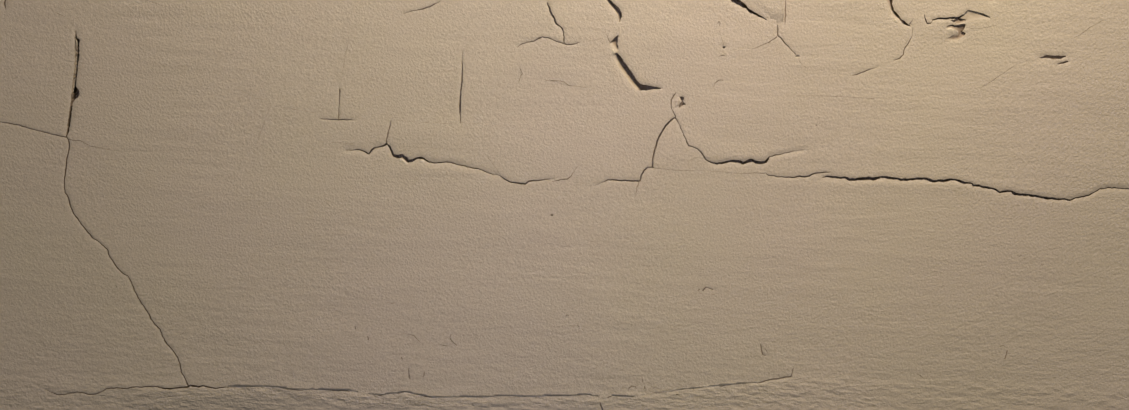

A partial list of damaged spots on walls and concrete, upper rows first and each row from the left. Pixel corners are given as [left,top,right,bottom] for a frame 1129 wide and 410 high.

crack [321,0,1129,201]
spalling [924,10,996,40]
crack [2,11,240,395]
crack [757,365,795,384]